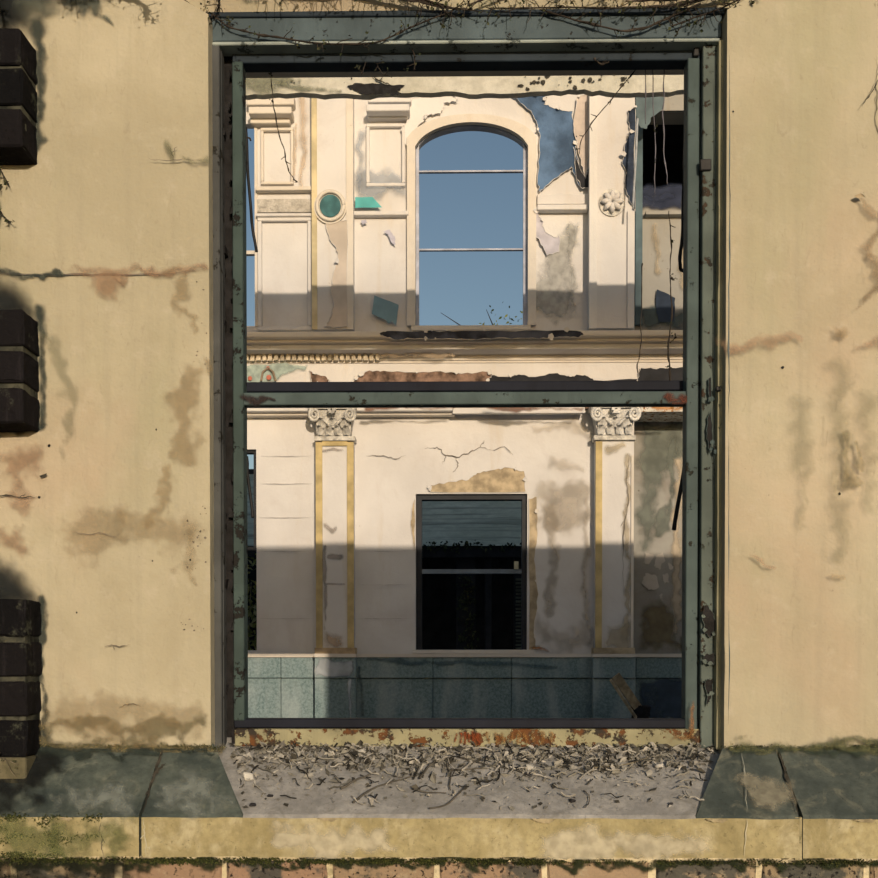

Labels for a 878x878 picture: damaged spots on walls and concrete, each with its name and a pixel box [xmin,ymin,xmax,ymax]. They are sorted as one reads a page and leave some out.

spalling [517,75,603,192]
crack [0,268,207,288]
peeling [324,220,348,328]
water stain [536,224,578,316]
spalling [353,366,683,382]
crack [425,443,512,472]
spalling [427,467,539,650]
water stain [39,596,205,753]
corrosion [454,731,554,745]
crack [140,750,166,857]